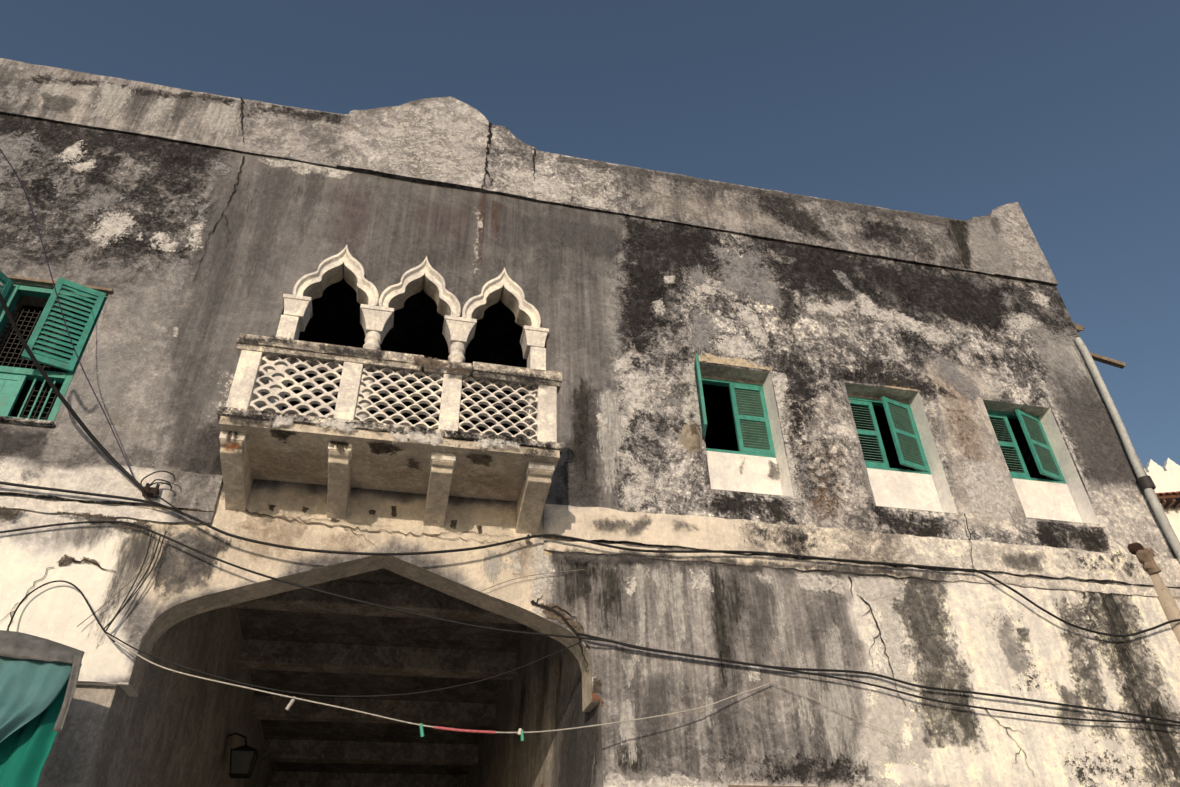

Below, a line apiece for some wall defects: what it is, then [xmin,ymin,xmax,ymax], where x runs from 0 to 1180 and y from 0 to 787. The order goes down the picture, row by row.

crack [193,97,244,280]
damp [557,155,1015,441]
damp [0,427,46,457]
damp [449,362,551,384]
damp [523,378,626,506]
damp [768,461,780,480]
damp [1029,325,1137,484]
crack [0,567,53,621]
damp [550,493,988,787]
crack [857,592,906,706]
damp [1030,521,1110,553]
damp [1053,580,1180,787]